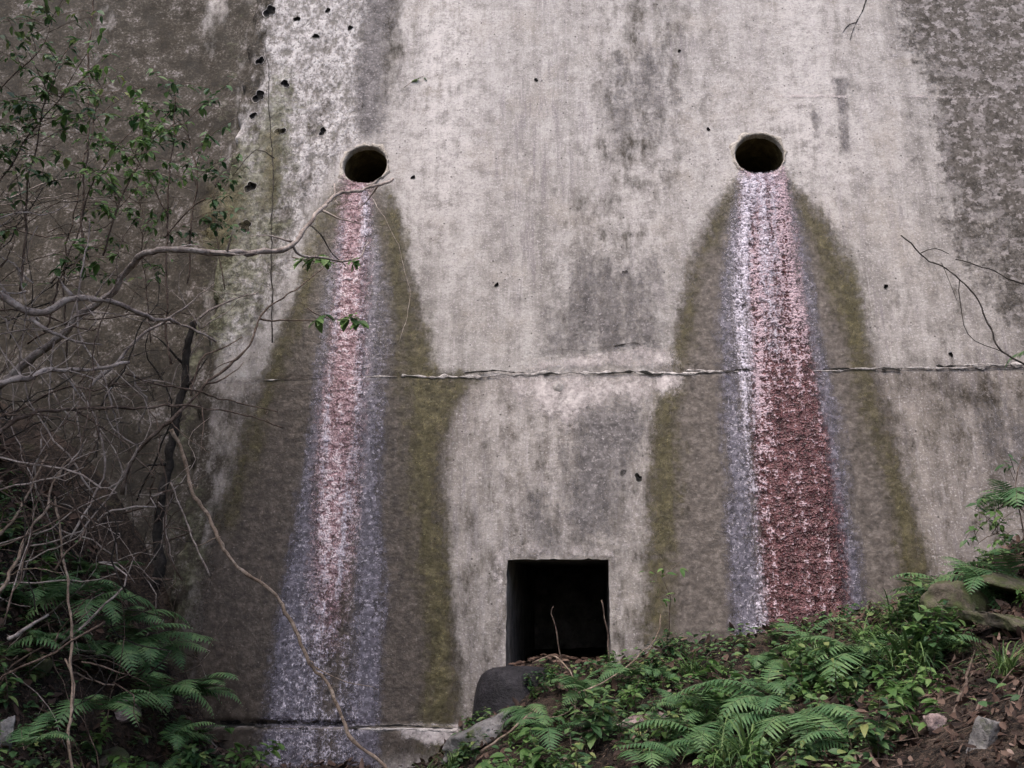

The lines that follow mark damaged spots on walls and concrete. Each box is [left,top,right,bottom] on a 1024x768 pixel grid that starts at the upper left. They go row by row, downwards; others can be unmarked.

corrosion [268,175,372,766]
water stain [189,184,467,768]
water stain [511,181,772,644]
corrosion [731,166,854,633]
water stain [781,176,929,613]